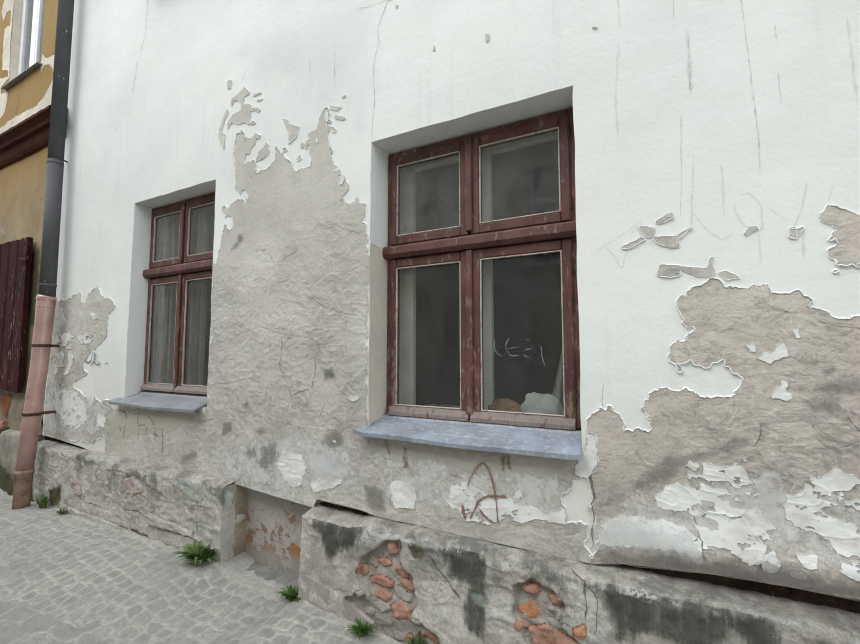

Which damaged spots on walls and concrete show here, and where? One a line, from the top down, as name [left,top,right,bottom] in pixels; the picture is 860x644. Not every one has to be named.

peeling [0,0,54,134]
peeling [43,80,860,600]
spalling [345,540,440,644]
leakage [312,519,485,638]
spalling [513,579,587,644]
leakage [596,584,781,644]
leakage [597,470,860,597]